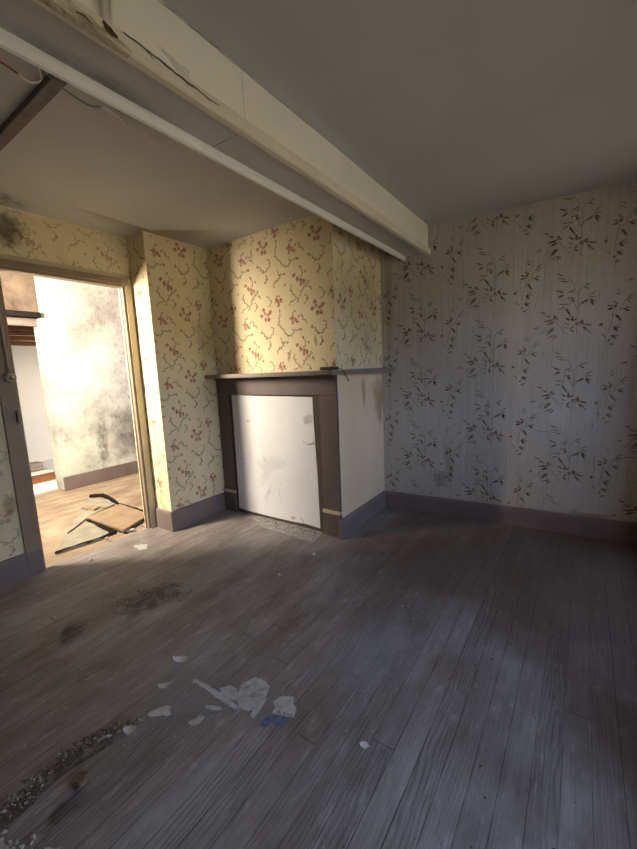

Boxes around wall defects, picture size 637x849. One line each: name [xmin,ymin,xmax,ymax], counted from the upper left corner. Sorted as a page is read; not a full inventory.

spalling [39,0,133,58]
crack [158,0,307,124]